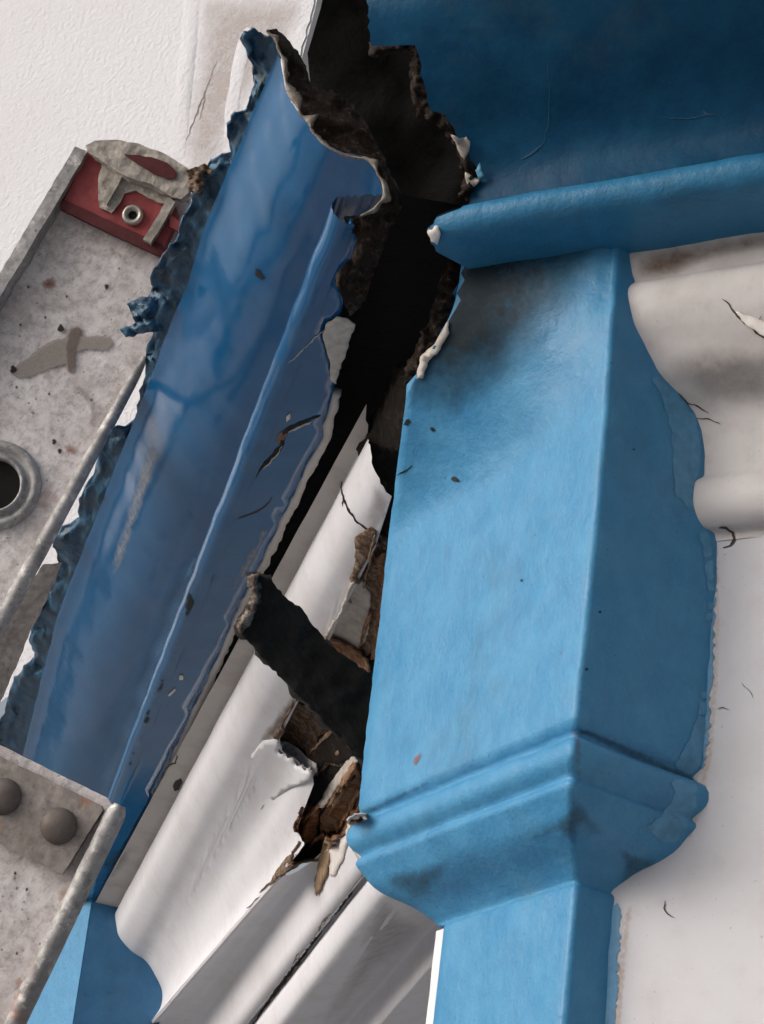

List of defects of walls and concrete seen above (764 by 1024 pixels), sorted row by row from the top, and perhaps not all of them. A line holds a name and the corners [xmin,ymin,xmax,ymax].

spalling [263,0,484,577]
crack [722,299,764,338]
crack [256,415,321,477]
crack [239,497,272,519]
crack [340,482,367,529]
spalling [214,634,239,683]
peeling [245,739,317,810]
peeling [314,813,367,896]